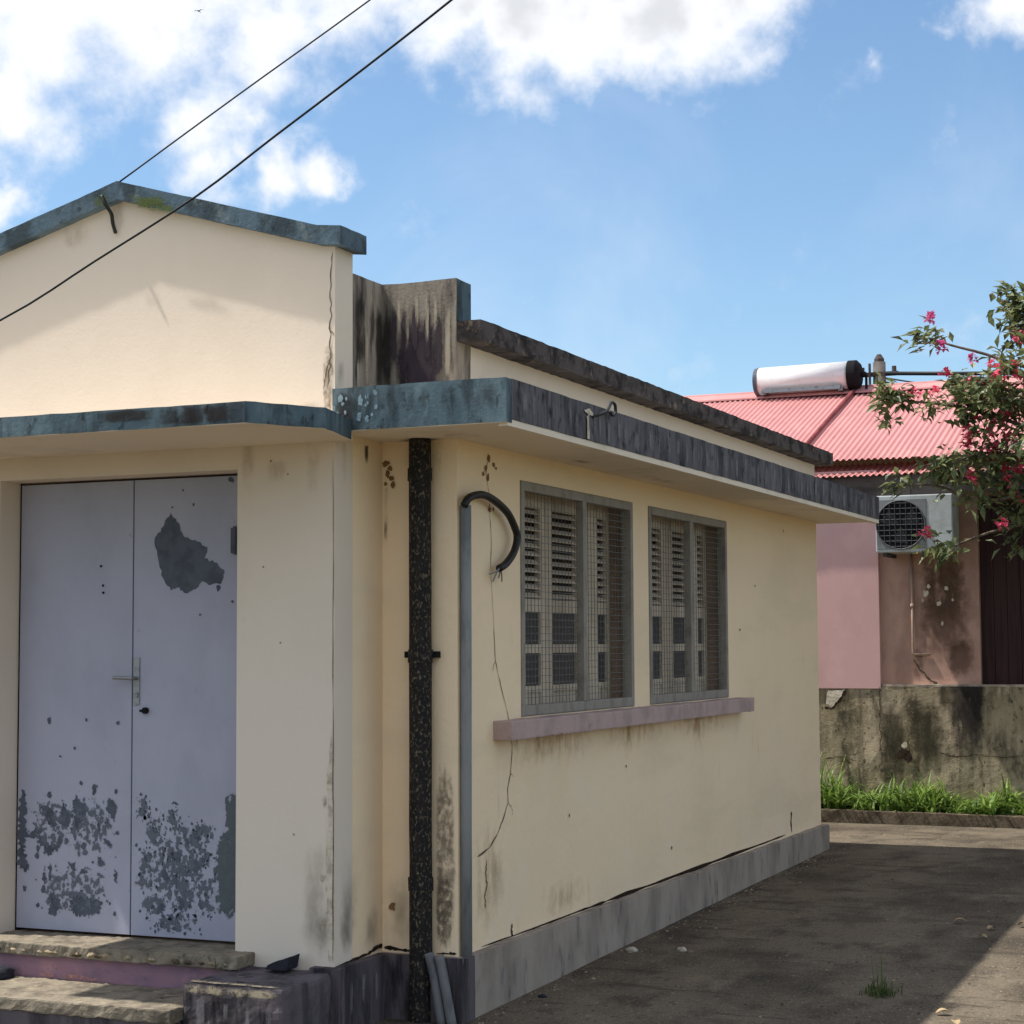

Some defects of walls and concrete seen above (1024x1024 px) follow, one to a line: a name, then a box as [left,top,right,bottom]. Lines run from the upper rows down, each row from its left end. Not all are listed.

crack [323,252,334,388]
peeling [333,390,378,423]
damp [357,296,450,398]
peeling [154,506,225,593]
damp [927,567,969,669]
crack [478,581,512,907]
damp [880,657,983,773]
peeling [16,781,119,918]
peeling [135,793,236,936]
damp [437,781,454,942]
crack [482,812,792,947]